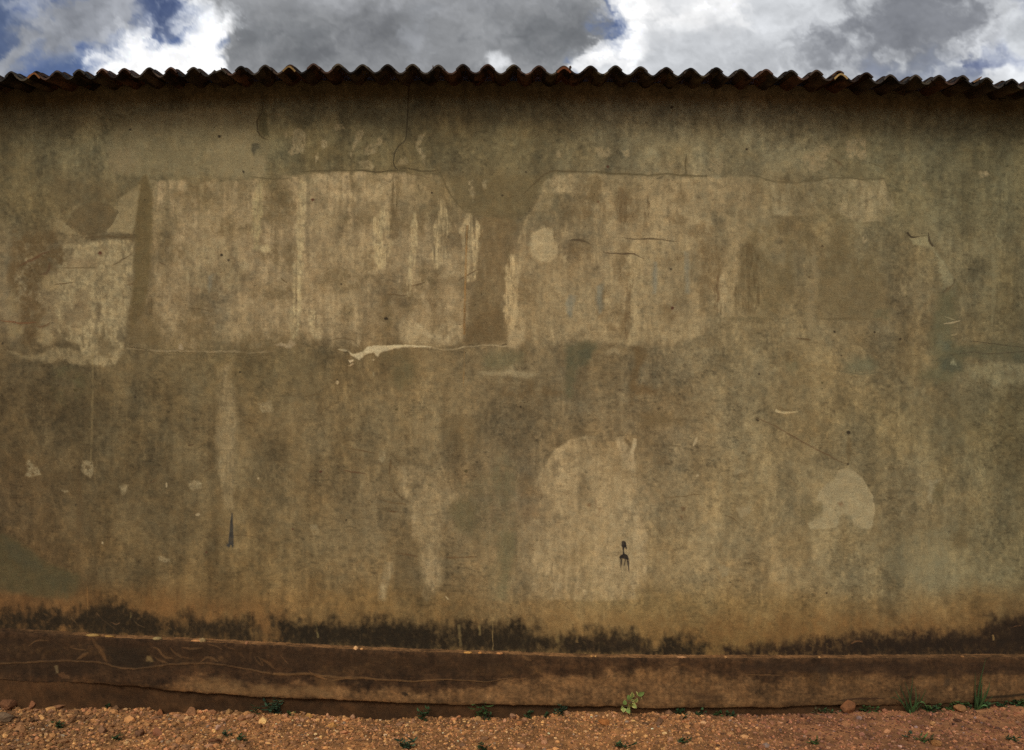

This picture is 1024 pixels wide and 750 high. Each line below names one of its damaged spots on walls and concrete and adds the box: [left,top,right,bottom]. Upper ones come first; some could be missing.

peeling [1,122,474,377]
crack [250,85,465,211]
damp [370,172,524,350]
crack [523,154,707,194]
damp [0,406,1024,688]